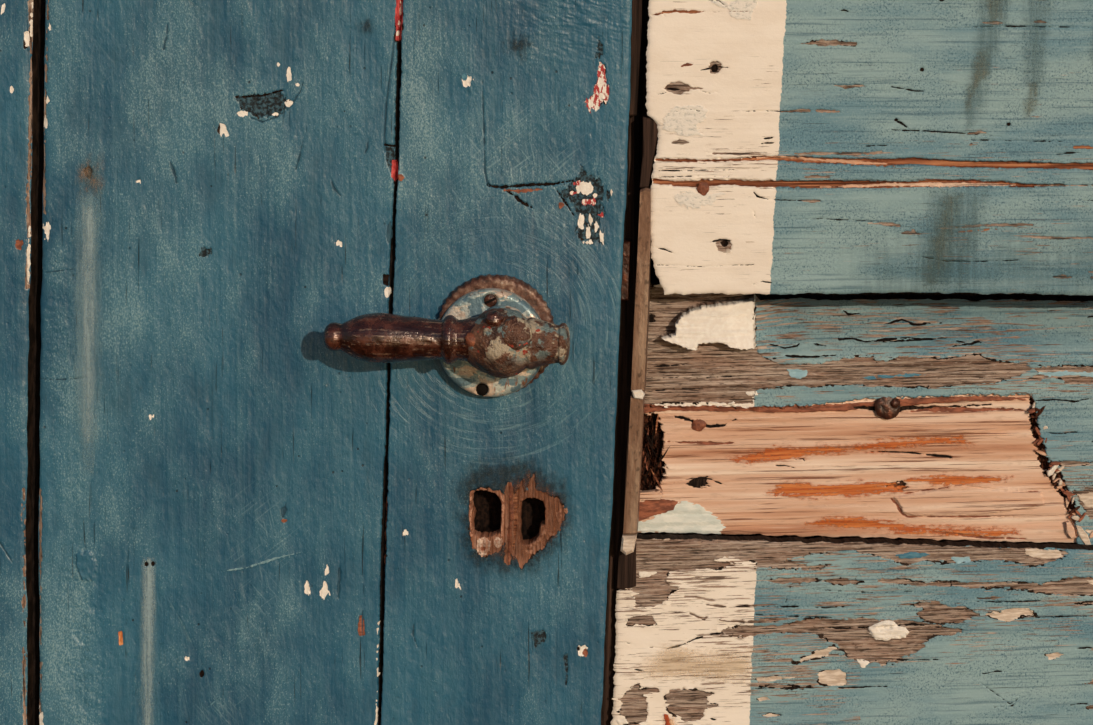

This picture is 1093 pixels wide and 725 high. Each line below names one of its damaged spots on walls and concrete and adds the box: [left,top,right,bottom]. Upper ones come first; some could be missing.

peeling [235,62,303,123]
peeling [585,36,609,117]
crack [482,81,574,216]
peeling [559,164,613,245]
peeling [644,284,1093,408]
peeling [894,485,1044,516]
peeling [1072,485,1093,534]
peeling [620,499,1093,701]
peeling [612,683,718,725]